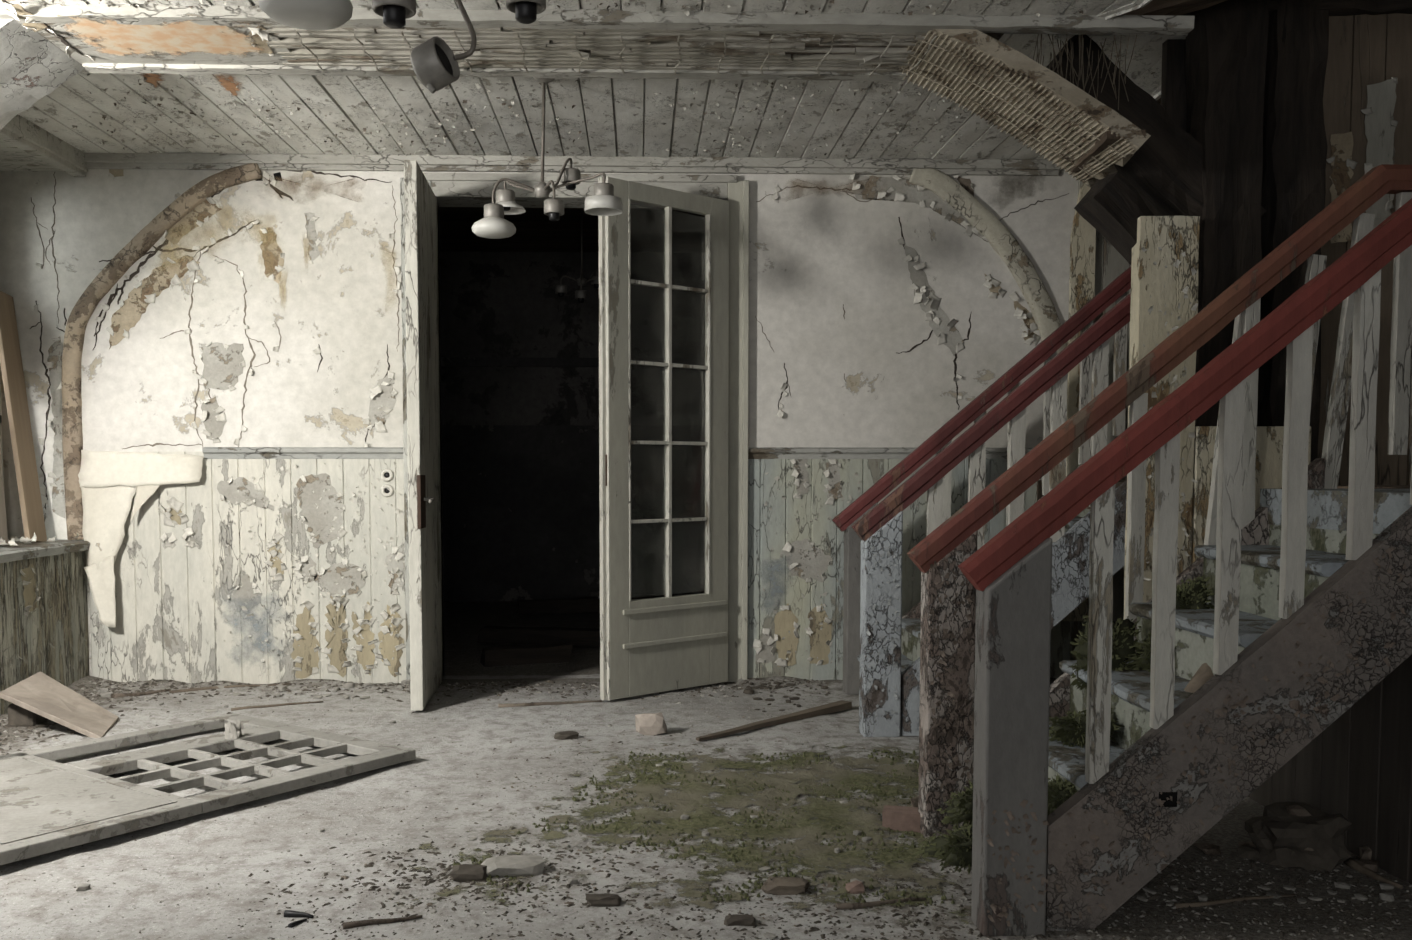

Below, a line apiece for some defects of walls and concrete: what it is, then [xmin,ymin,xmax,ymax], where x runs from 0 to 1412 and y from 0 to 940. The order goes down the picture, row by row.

peeling [1,0,275,56]
peeling [72,73,607,157]
peeling [1326,77,1398,203]
spalling [106,197,222,349]
peeling [258,227,285,284]
peeling [304,212,321,264]
peeling [199,342,246,443]
peeling [367,370,398,433]
crack [898,286,972,410]
peeling [158,496,199,549]
peeling [217,463,406,679]
peeling [866,536,974,804]